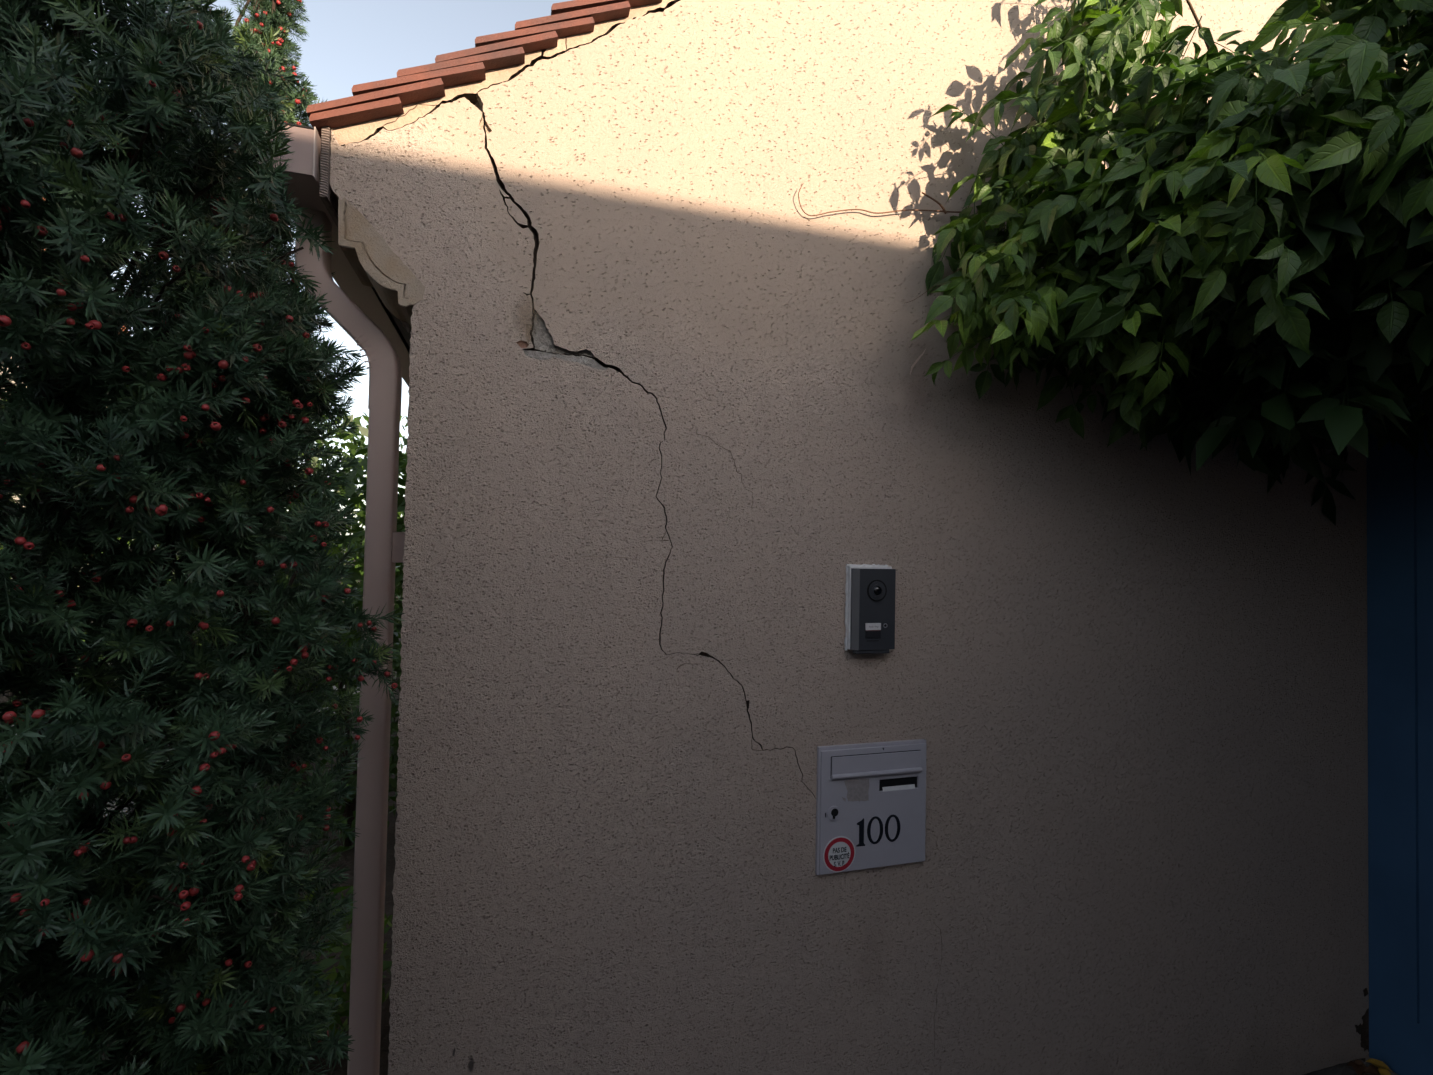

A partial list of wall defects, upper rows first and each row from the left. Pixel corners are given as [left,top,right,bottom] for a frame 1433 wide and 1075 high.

spalling [516,310,607,370]
crack [341,0,815,797]